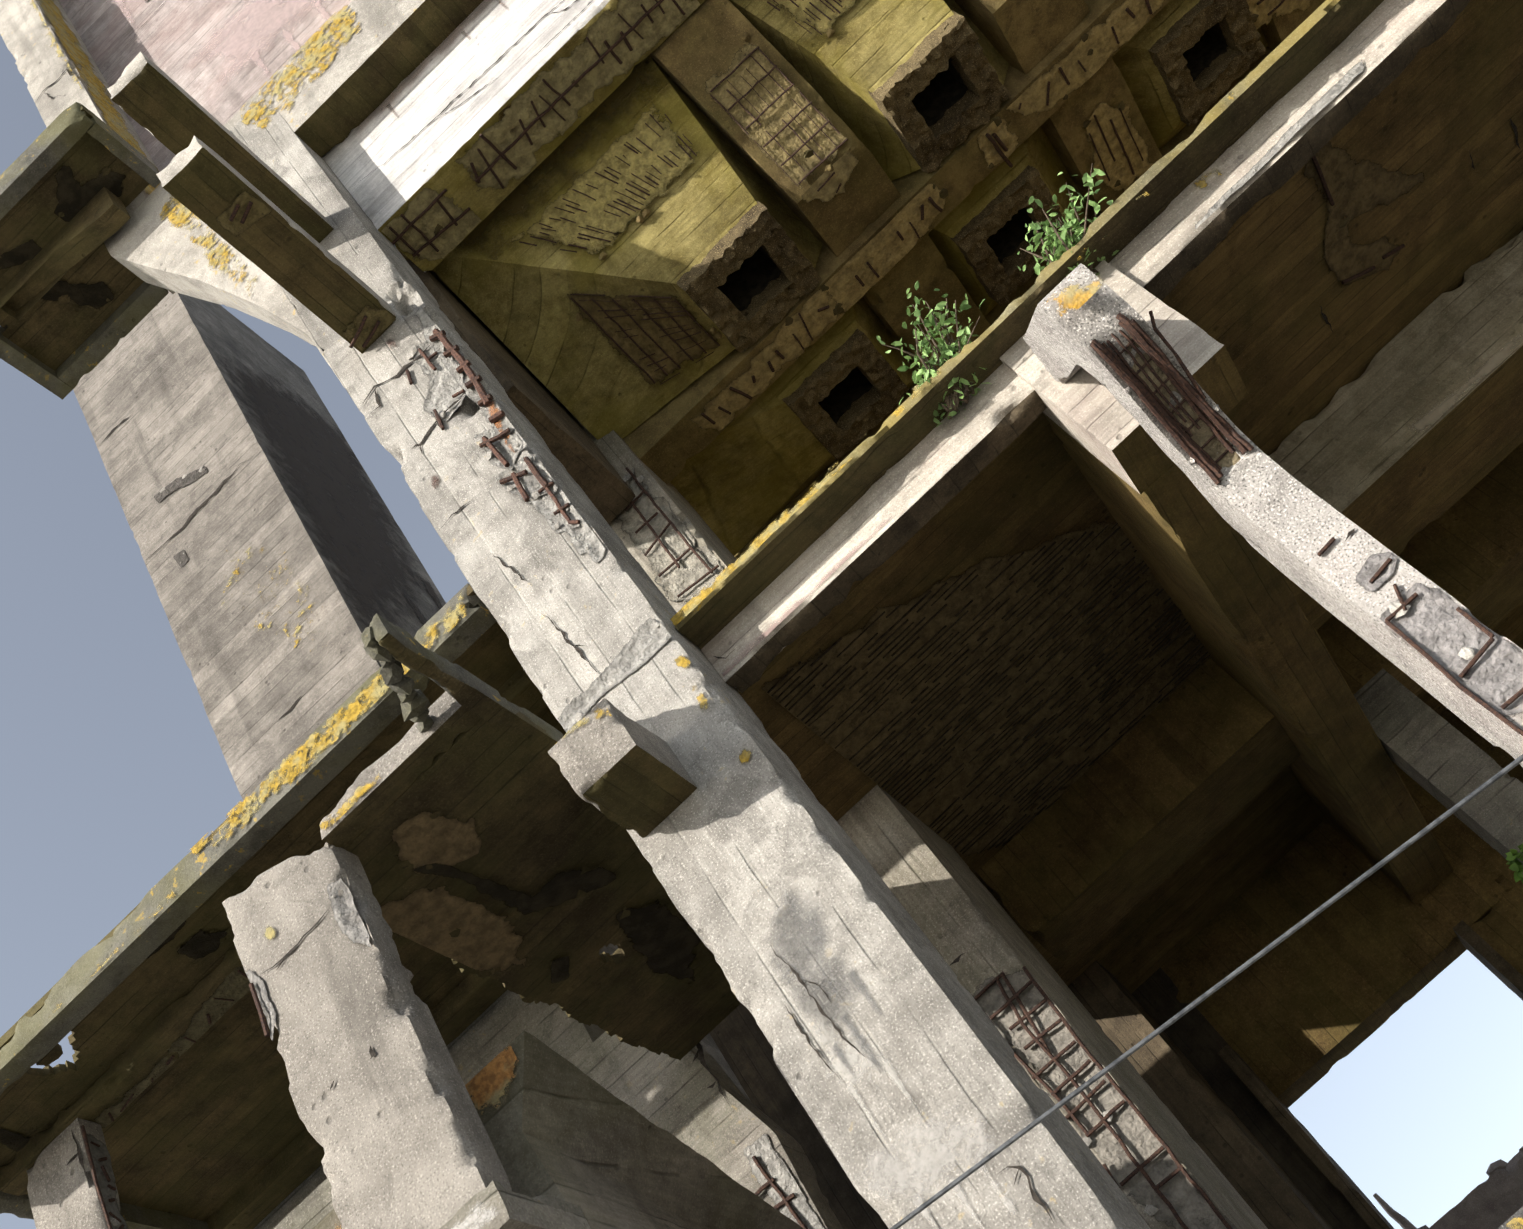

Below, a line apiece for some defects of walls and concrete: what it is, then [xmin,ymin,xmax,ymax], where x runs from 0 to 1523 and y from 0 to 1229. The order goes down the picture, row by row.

spalling [382,188,482,261]
spalling [455,0,700,191]
spalling [512,105,698,260]
spalling [567,293,722,385]
spalling [705,32,859,203]
spalling [690,183,948,431]
spalling [1090,310,1254,485]
spalling [1317,537,1336,557]
spalling [1356,552,1523,736]
crack [768,943,877,1079]
spalling [973,966,1232,1229]